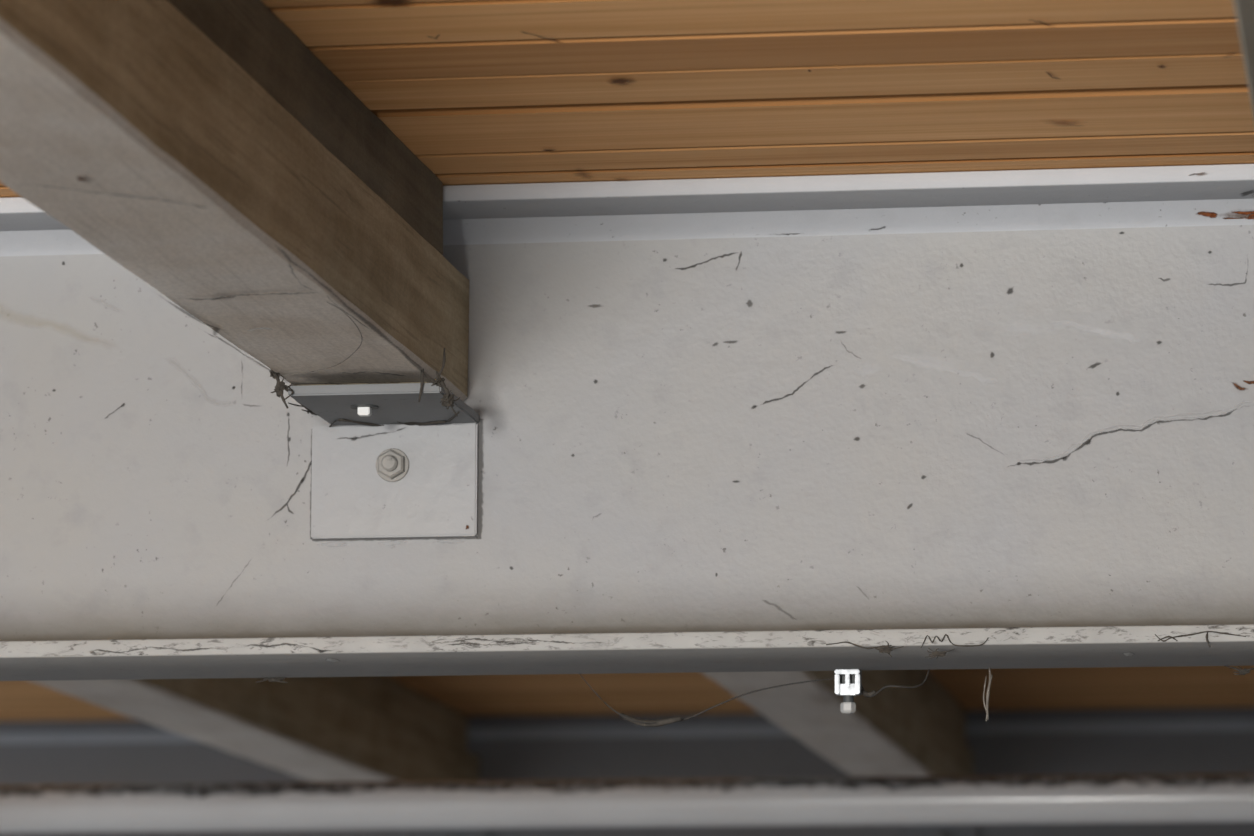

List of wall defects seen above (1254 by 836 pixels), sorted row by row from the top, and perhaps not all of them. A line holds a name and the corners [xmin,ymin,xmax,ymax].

crack [752,367,829,408]
crack [1016,420,1171,465]